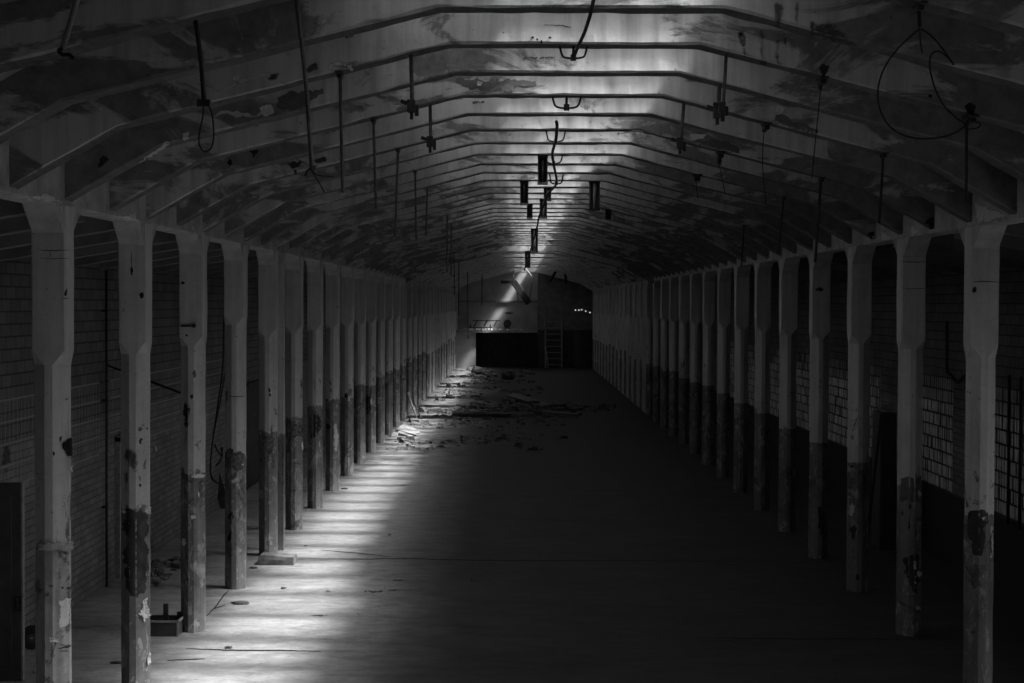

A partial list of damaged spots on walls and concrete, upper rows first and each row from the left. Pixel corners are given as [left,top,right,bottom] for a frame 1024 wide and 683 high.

peeling [967,509,994,558]
peeling [121,507,151,623]
peeling [49,585,71,643]